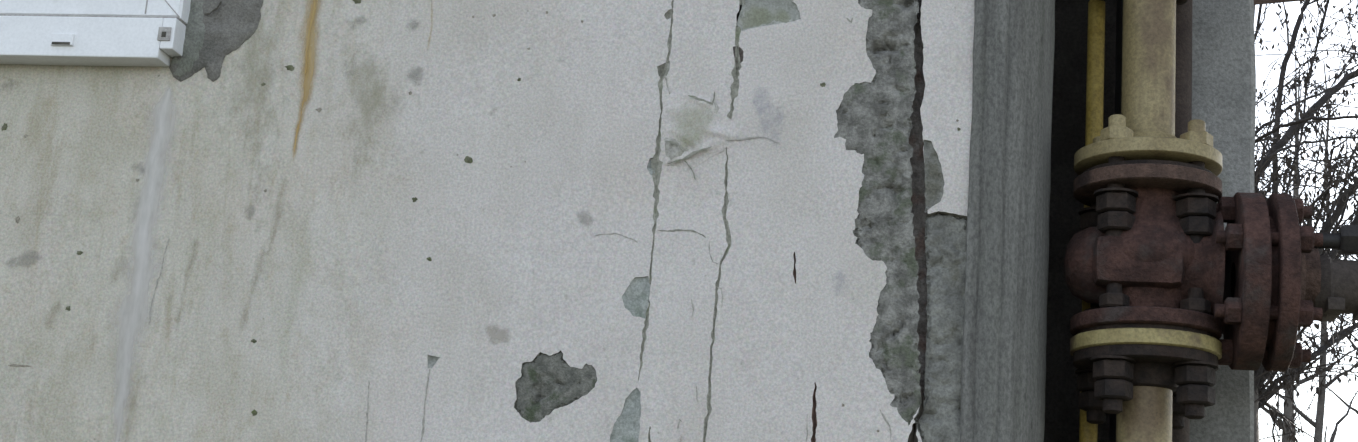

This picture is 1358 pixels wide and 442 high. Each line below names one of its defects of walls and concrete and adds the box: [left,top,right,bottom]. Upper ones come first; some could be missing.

peeling [737,0,801,31]
rust [294,0,318,152]
peeling [660,87,779,179]
crack [595,0,745,442]
spalling [834,0,967,442]
peeling [622,276,650,319]
crack [420,355,440,442]
spalling [514,351,597,423]
peeling [610,388,641,442]
crack [880,393,924,442]